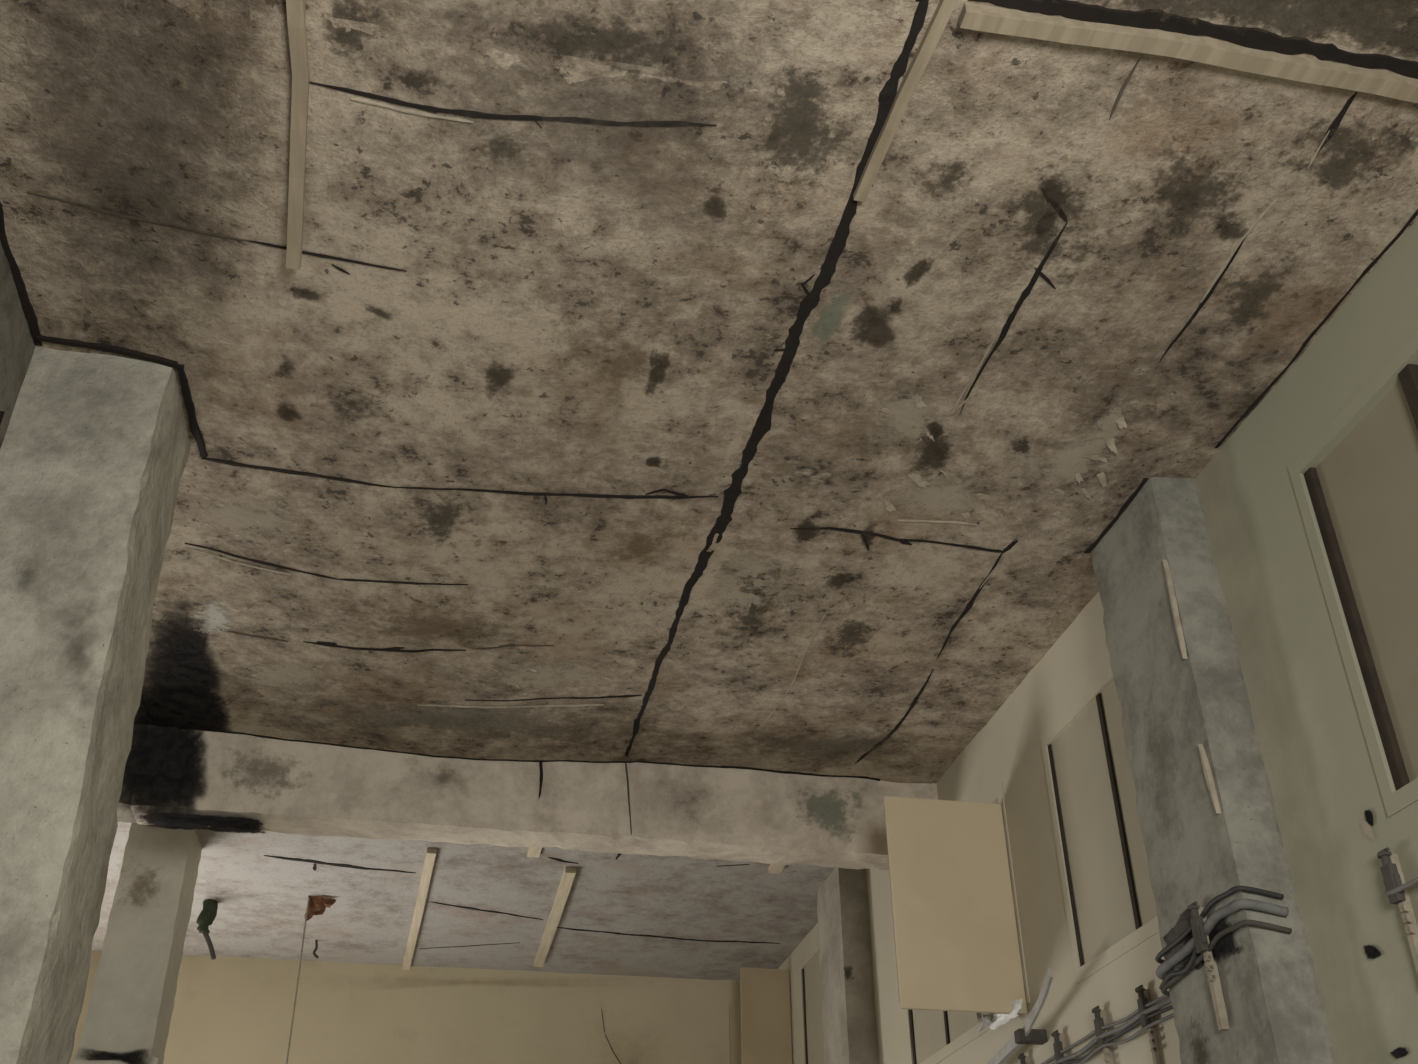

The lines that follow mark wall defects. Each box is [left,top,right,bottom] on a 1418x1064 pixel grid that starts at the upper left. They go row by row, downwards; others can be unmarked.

crack [969,0,1418,170]
crack [951,188,1068,415]
crack [1160,198,1278,361]
crack [1215,209,1418,448]
crack [0,0,1018,860]
crack [1084,478,1149,553]
water stain [193,602,235,632]